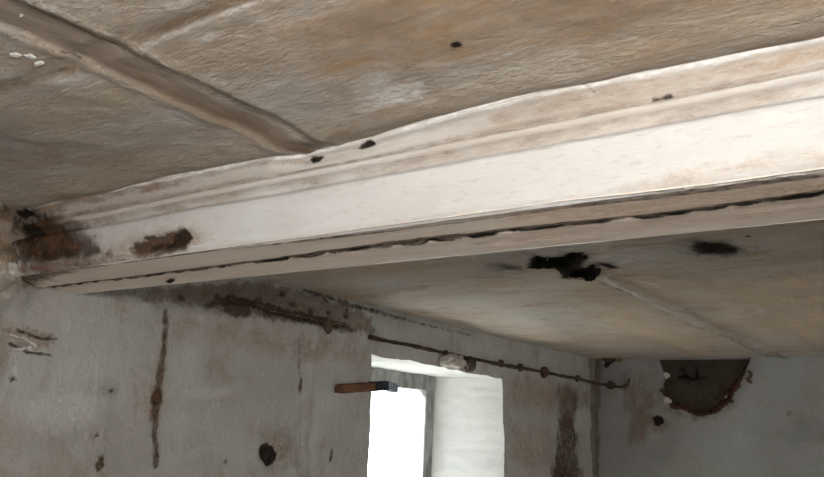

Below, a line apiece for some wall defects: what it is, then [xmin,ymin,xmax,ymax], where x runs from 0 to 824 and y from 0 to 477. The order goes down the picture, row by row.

spalling [0,205,29,301]
spalling [130,228,193,258]
crack [40,172,824,288]
peeling [5,327,57,356]
spalling [659,358,750,419]